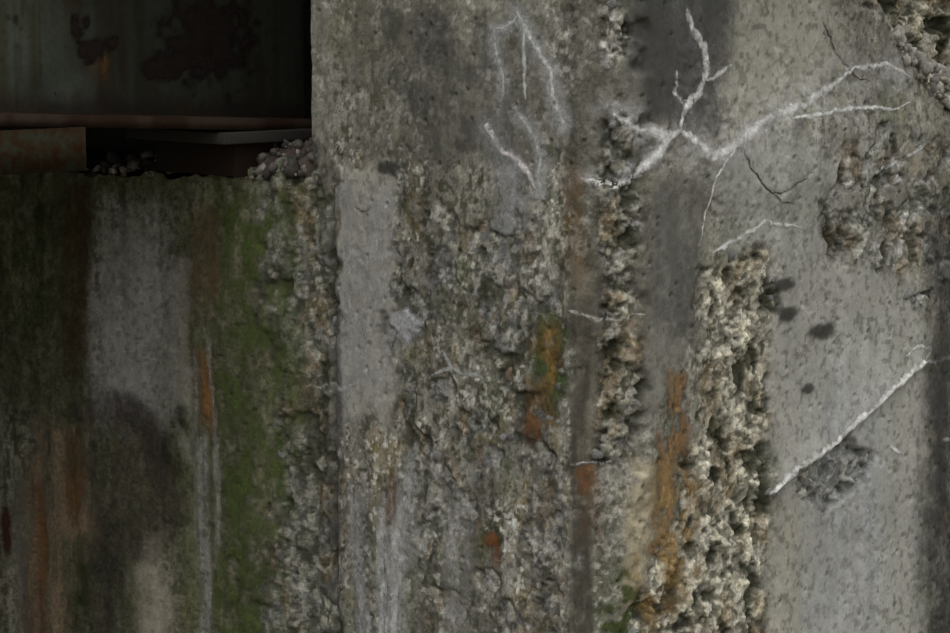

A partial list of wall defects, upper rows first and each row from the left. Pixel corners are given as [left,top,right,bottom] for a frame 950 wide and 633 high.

crack [481,6,570,236]
spalling [597,0,637,71]
crack [580,9,912,253]
spalling [820,121,950,316]
spalling [848,0,950,109]
crack [881,138,937,170]
rust [649,368,698,588]
spalling [628,244,779,633]
spalling [795,436,869,513]
crack [770,344,950,495]